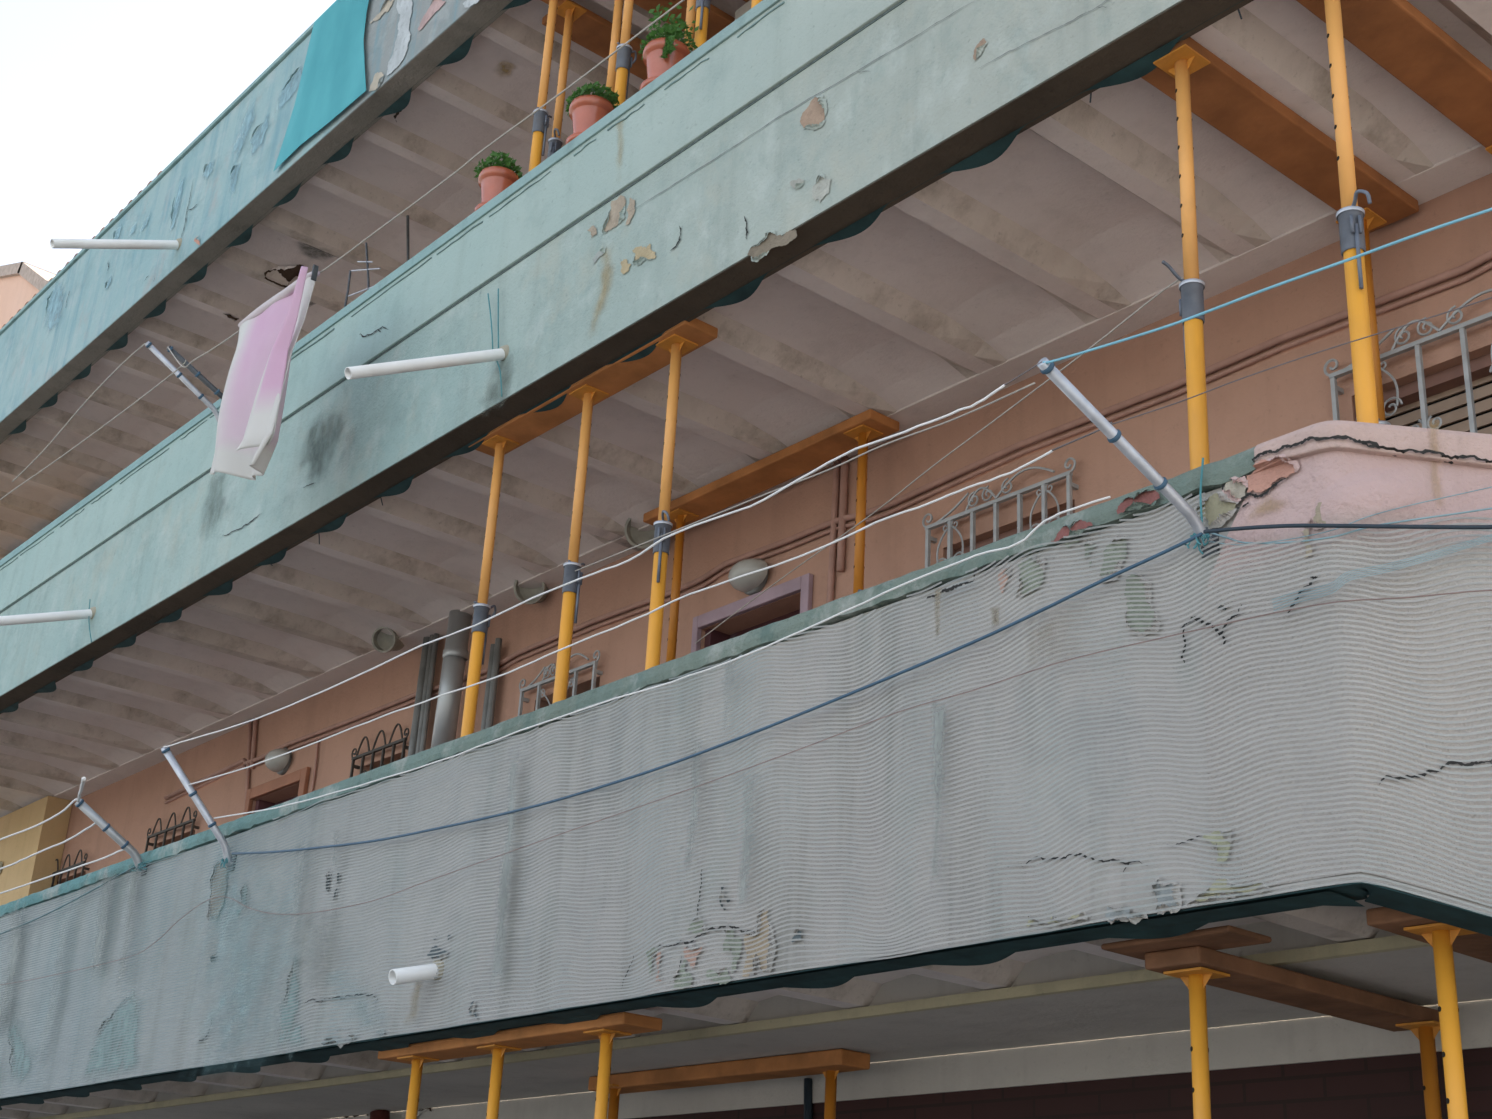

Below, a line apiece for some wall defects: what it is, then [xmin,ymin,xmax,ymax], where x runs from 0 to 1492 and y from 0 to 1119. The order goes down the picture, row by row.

peeling [369,0,479,92]
peeling [800,95,828,131]
peeling [587,195,635,263]
peeling [620,244,656,274]
spalling [747,230,797,262]
peeling [1196,454,1300,529]
crack [1222,435,1492,509]
crack [1181,605,1242,663]
crack [1379,760,1492,785]
crack [1026,853,1148,872]
peeling [646,887,802,989]